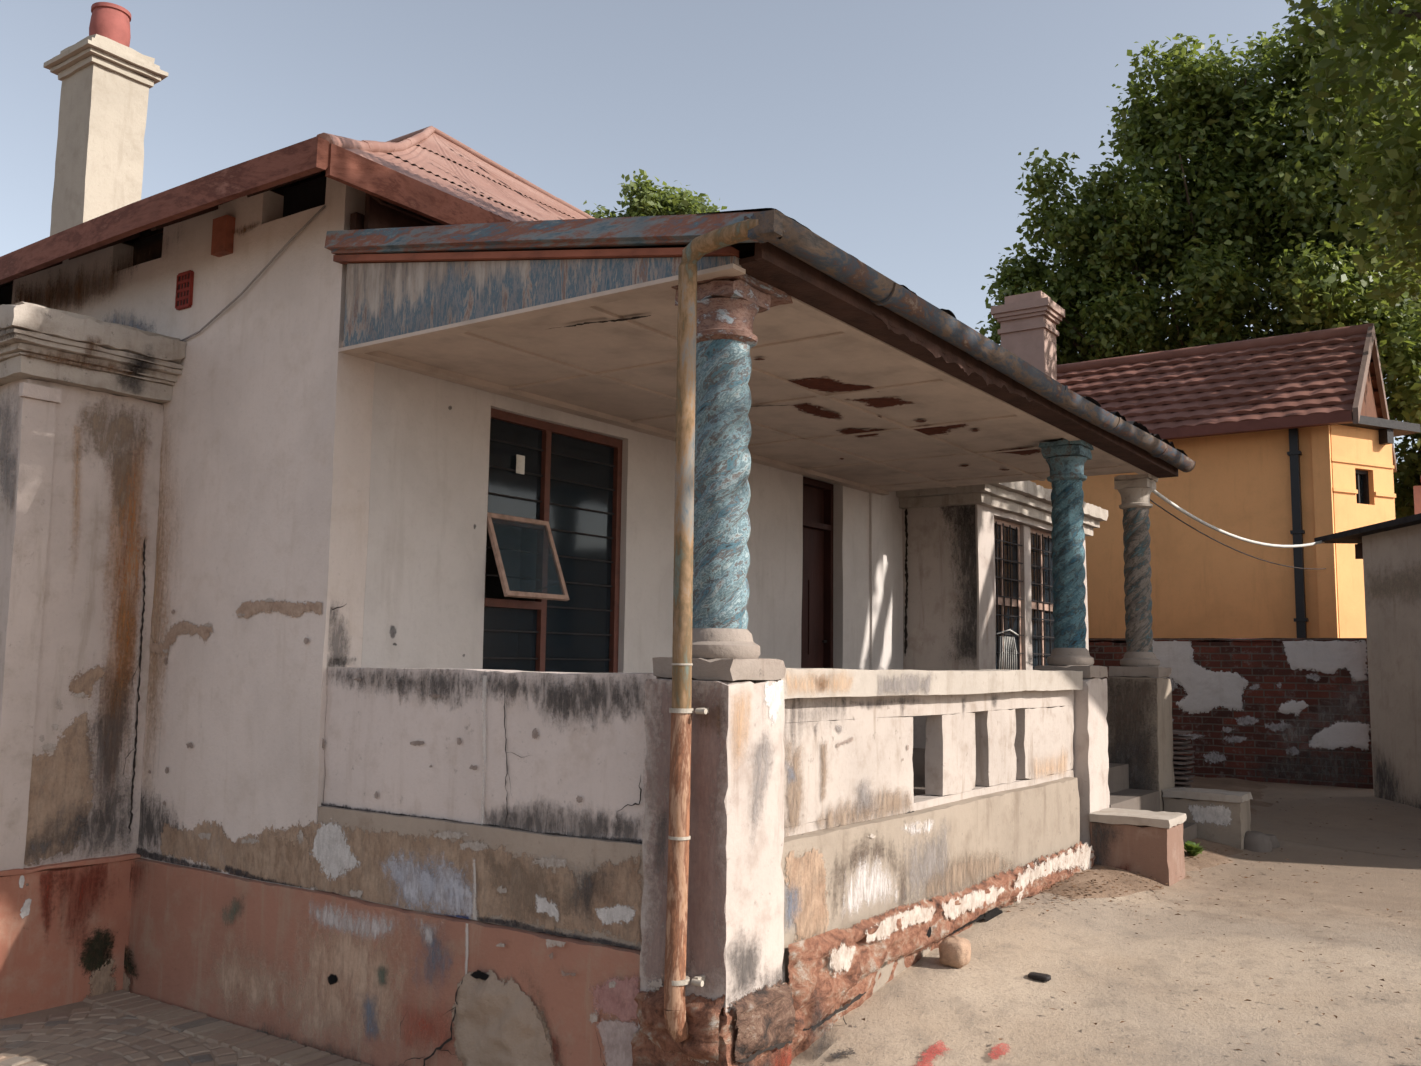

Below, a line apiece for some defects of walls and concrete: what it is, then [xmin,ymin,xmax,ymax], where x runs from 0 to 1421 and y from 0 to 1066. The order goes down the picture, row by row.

damp [82,401,146,516]
peeling [149,610,213,666]
peeling [236,598,322,619]
damp [1108,678,1156,790]
peeling [1138,640,1310,764]
peeling [1283,640,1368,682]
peeling [1286,720,1371,756]
damp [321,607,672,986]
damp [686,683,782,993]
peeling [160,820,581,1040]
flaking render [589,841,1096,1066]